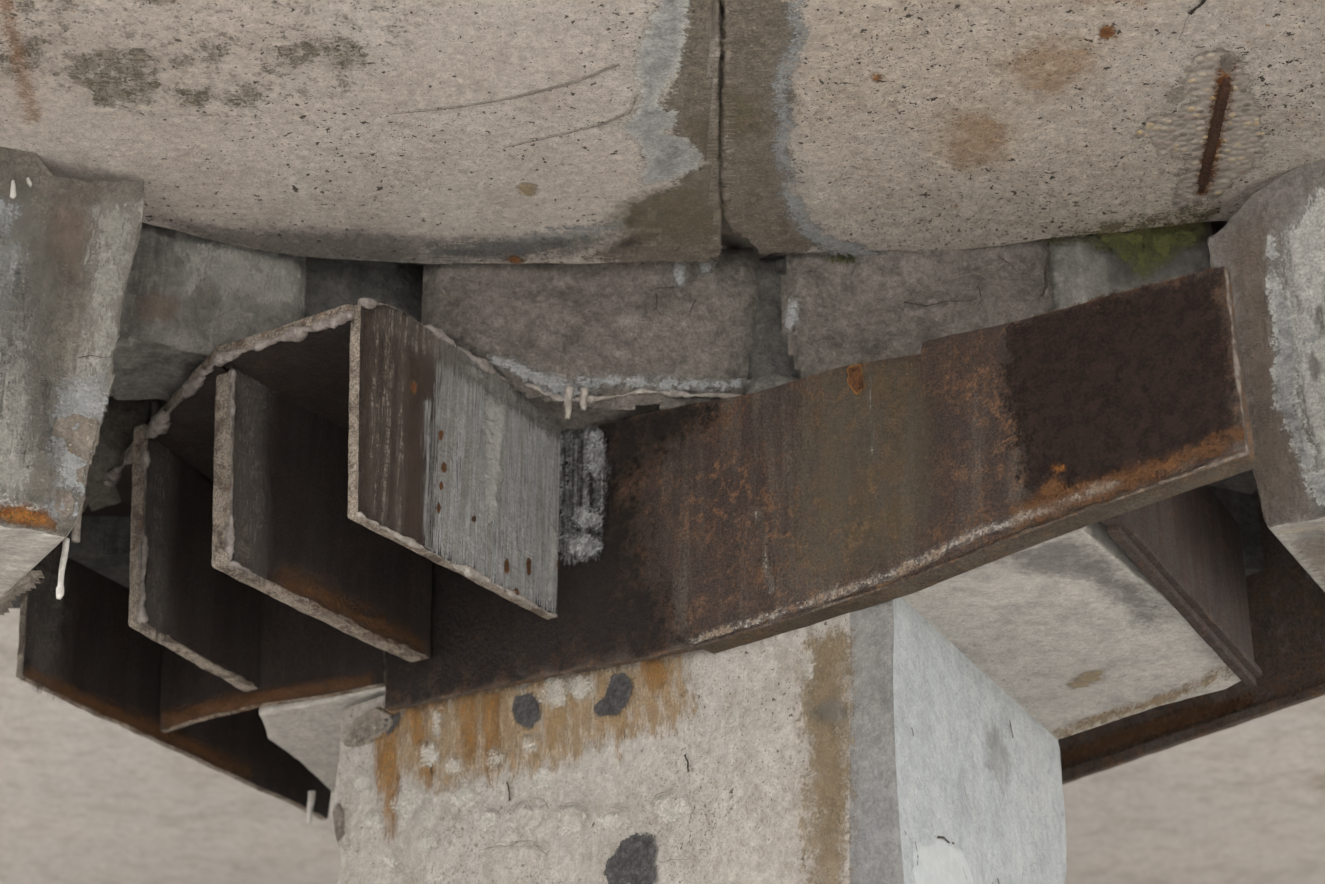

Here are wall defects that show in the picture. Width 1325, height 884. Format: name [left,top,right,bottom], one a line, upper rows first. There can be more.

crack [1179,0,1206,49]
water stain [432,0,878,288]
water stain [0,165,143,523]
water stain [138,242,304,319]
water stain [1236,186,1325,507]
corrosion [0,503,60,531]
water stain [229,368,272,582]
corrosion [374,655,695,839]
peeling [912,836,976,884]